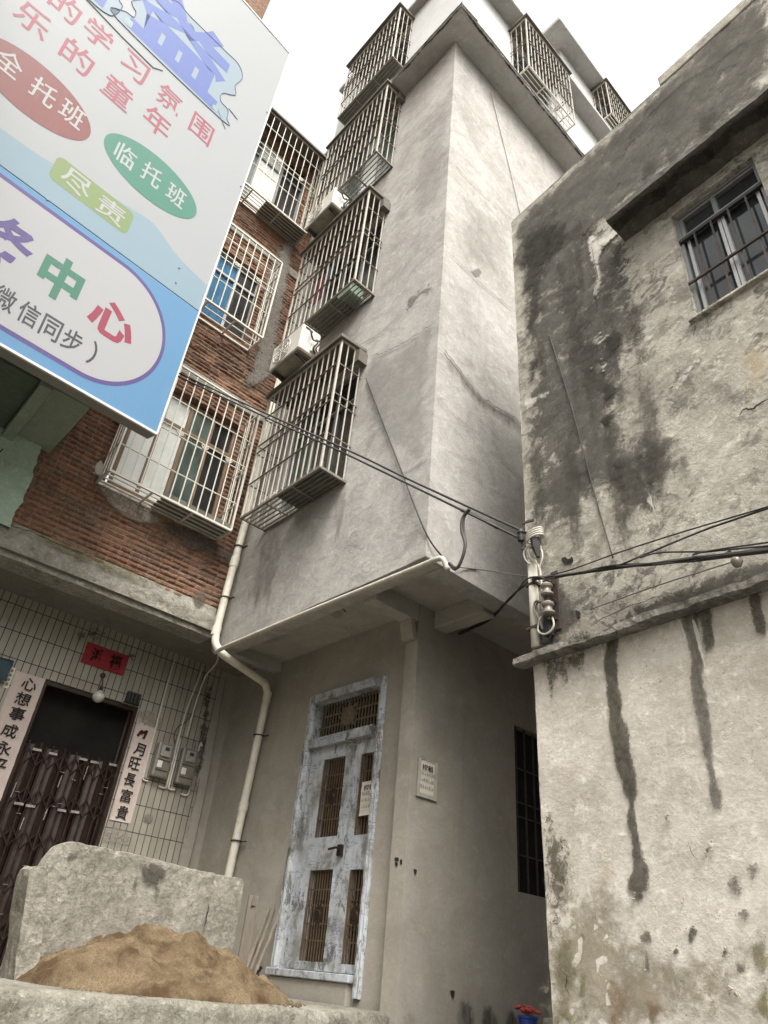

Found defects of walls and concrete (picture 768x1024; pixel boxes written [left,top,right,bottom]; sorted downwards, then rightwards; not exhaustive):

leakage [391,0,768,545]
leakage [543,810,574,937]
leakage [599,638,650,894]
leakage [676,608,722,809]